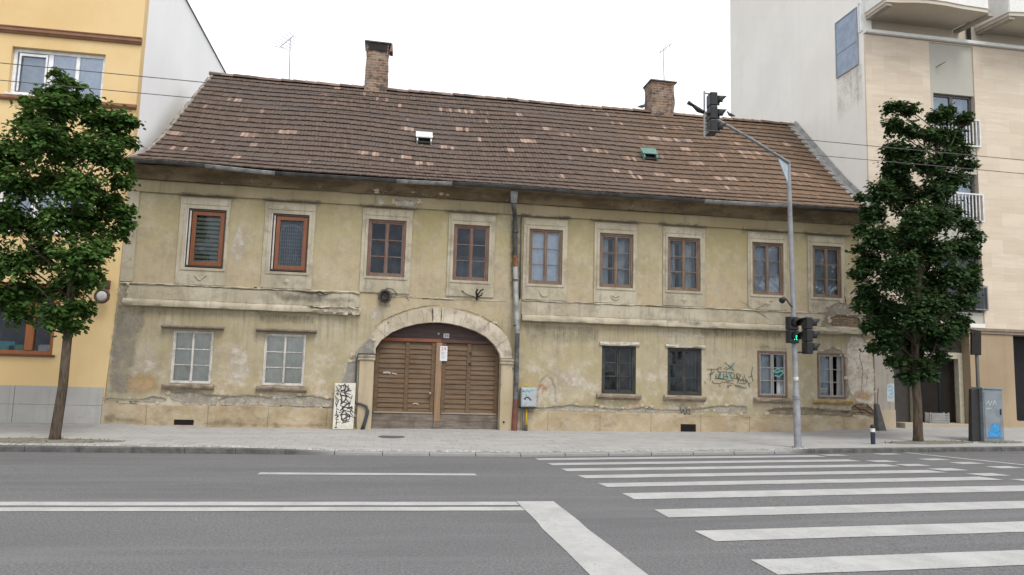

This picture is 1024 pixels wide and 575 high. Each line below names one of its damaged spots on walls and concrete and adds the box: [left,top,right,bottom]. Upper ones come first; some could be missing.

spalling [103,391,333,408]
peeling [764,300,877,419]